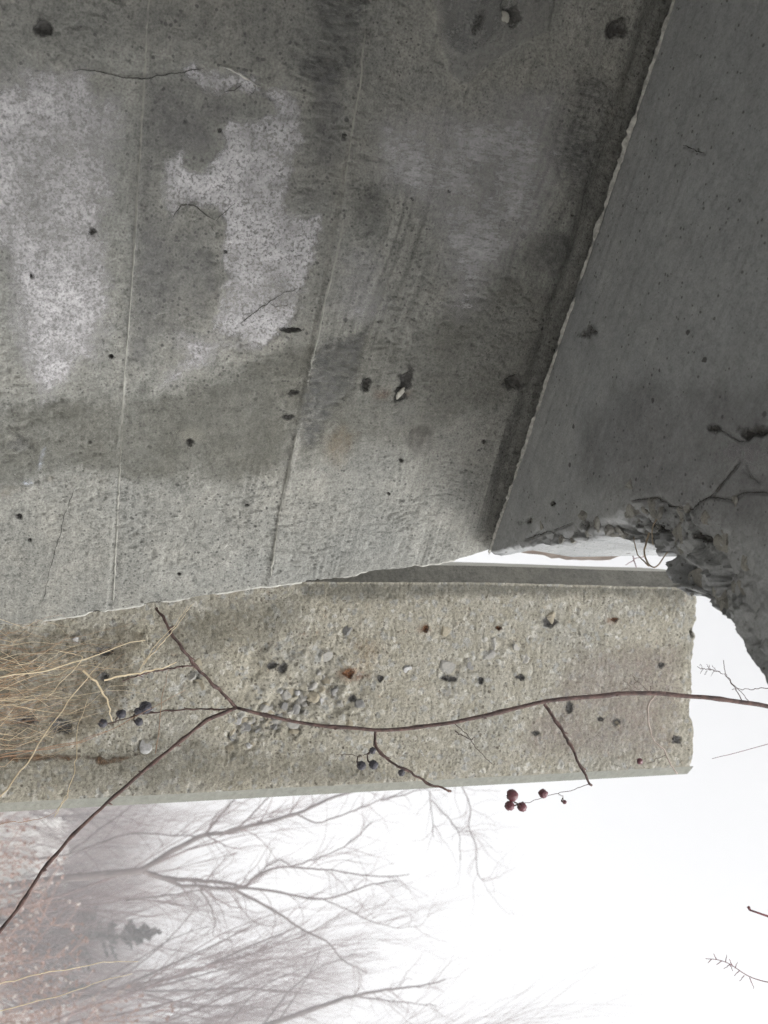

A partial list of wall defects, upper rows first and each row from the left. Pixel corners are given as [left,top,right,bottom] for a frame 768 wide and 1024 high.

crack [75,68,203,80]
water stain [580,0,675,280]
water stain [0,74,113,390]
crack [174,203,235,229]
water stain [386,121,537,306]
crack [242,289,296,322]
water stain [16,350,316,479]
water stain [488,297,576,554]
crack [633,429,767,510]
spalling [559,478,728,556]
spalling [543,611,558,629]
flaking render [512,644,530,681]